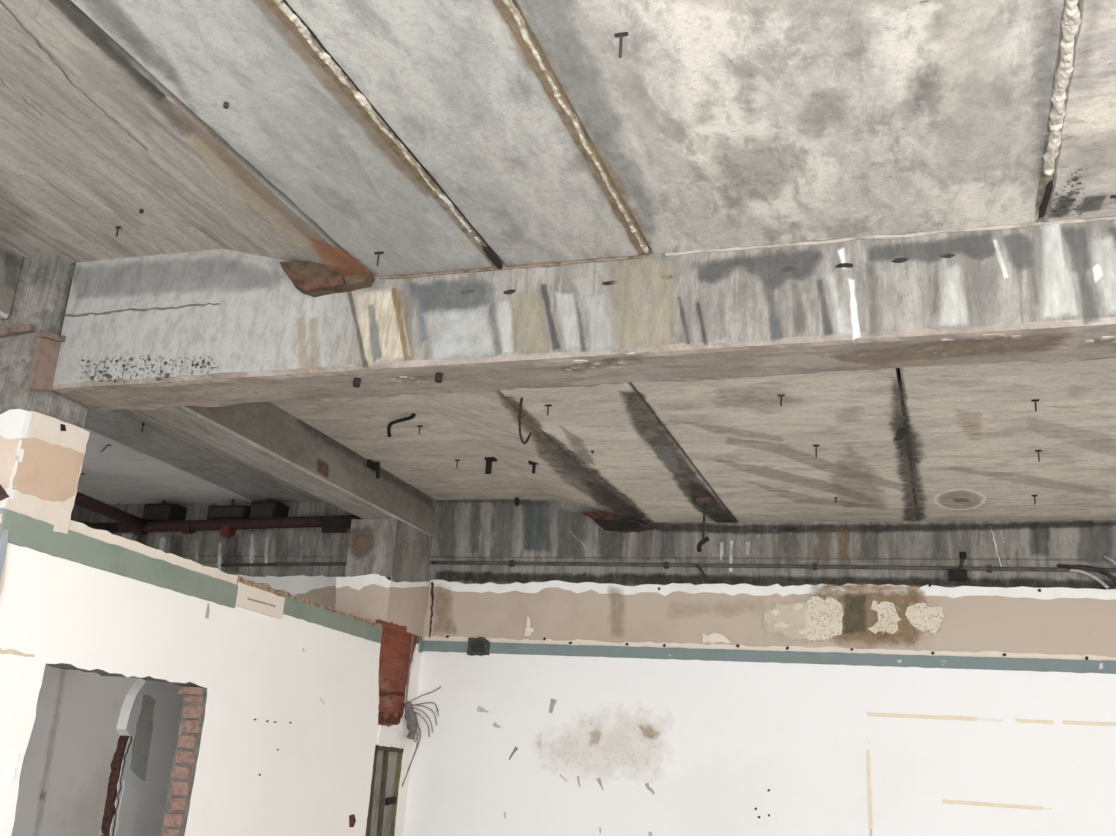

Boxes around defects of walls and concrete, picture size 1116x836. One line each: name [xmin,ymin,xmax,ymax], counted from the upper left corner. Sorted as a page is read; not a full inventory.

water stain [50,0,191,133]
rust [263,0,325,65]
rust [176,106,372,275]
rust [348,288,409,367]
water stain [871,234,1031,326]
water stain [1043,169,1116,323]
water stain [437,382,1116,644]
spalling [376,619,418,726]
flaking render [764,590,845,650]
flaking render [867,600,944,635]
flaking render [101,695,156,836]
spalling [160,686,207,836]